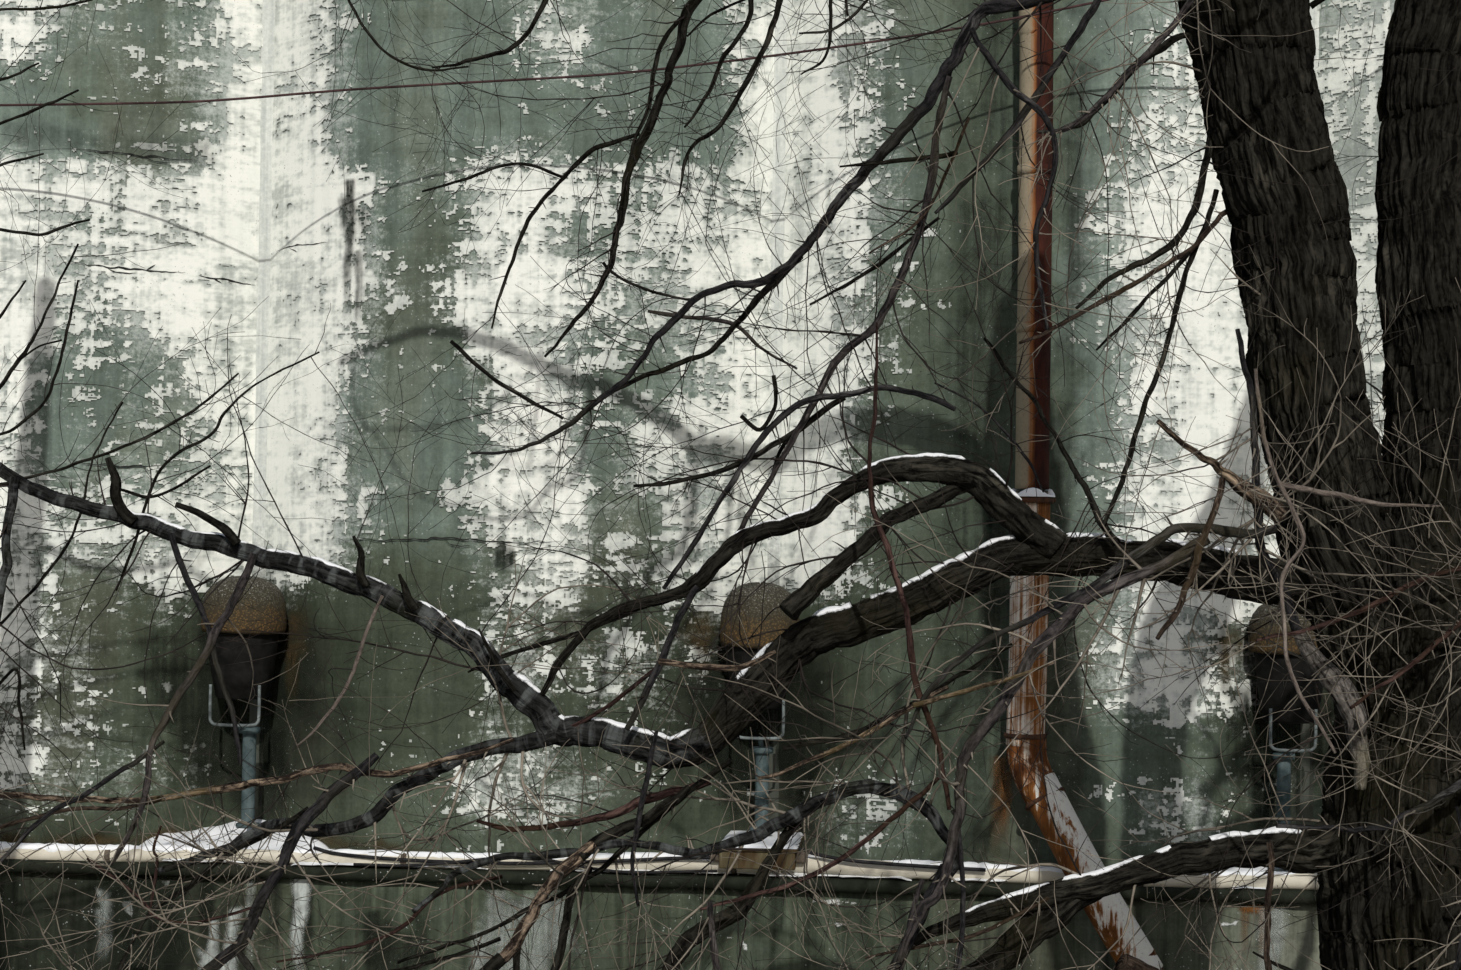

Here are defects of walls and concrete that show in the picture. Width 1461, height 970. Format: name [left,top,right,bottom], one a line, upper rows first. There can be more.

peeling [0,0,952,821]
peeling [1070,15,1280,558]
peeling [1316,0,1392,444]
peeling [433,745,612,852]
peeling [804,765,931,854]
peeling [1079,581,1262,844]